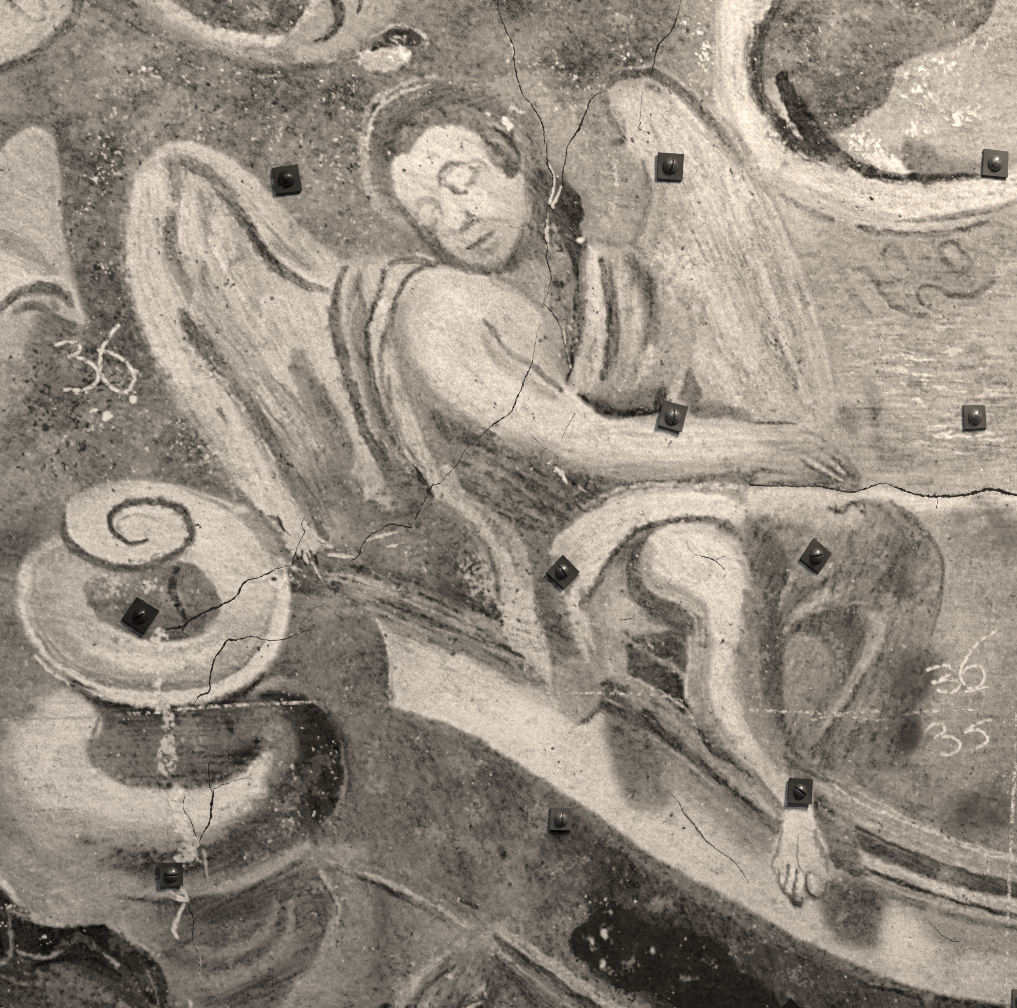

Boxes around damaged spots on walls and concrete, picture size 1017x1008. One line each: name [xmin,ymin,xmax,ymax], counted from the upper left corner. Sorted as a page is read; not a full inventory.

crack [638,1,681,130]
crack [351,9,603,561]
crack [749,483,1017,508]
crack [165,515,305,637]
crack [195,606,322,702]
crack [167,763,242,844]